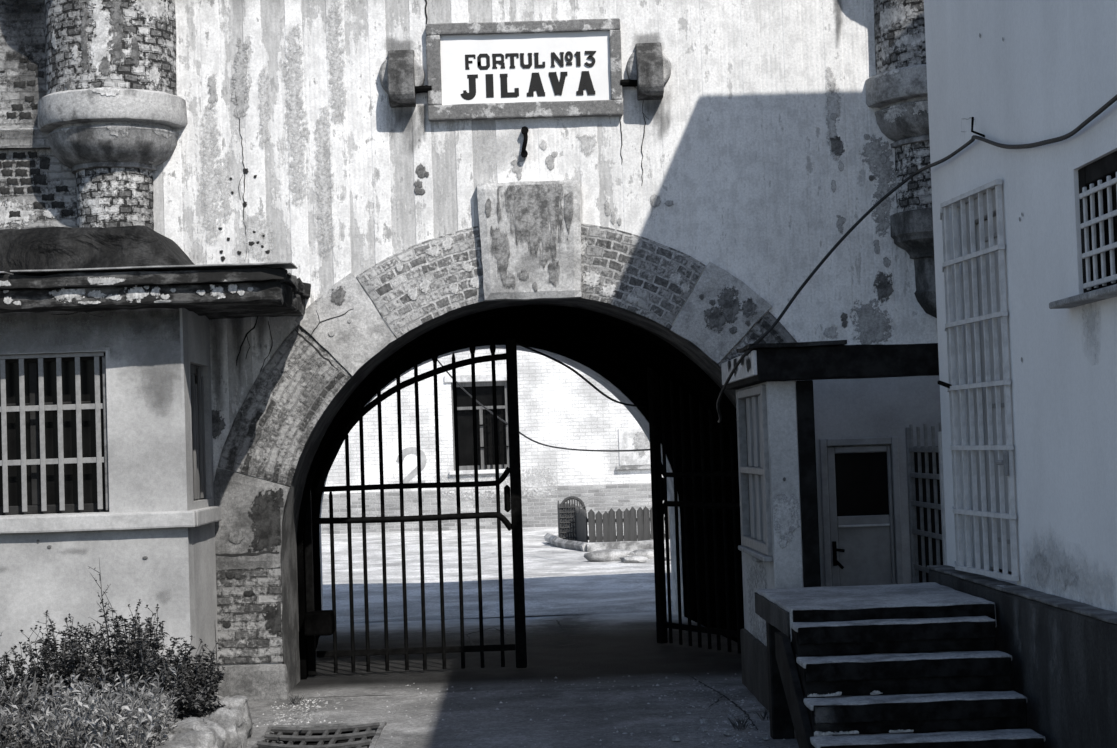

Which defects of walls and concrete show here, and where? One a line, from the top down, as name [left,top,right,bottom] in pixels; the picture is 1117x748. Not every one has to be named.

peeling [72,0,168,96]
flaking render [6,57,44,119]
flaking render [106,123,139,137]
flaking render [153,127,172,139]
crack [233,81,247,259]
flaking render [0,151,74,218]
peeling [0,280,21,305]
peeling [49,277,176,305]
peeling [196,280,254,299]